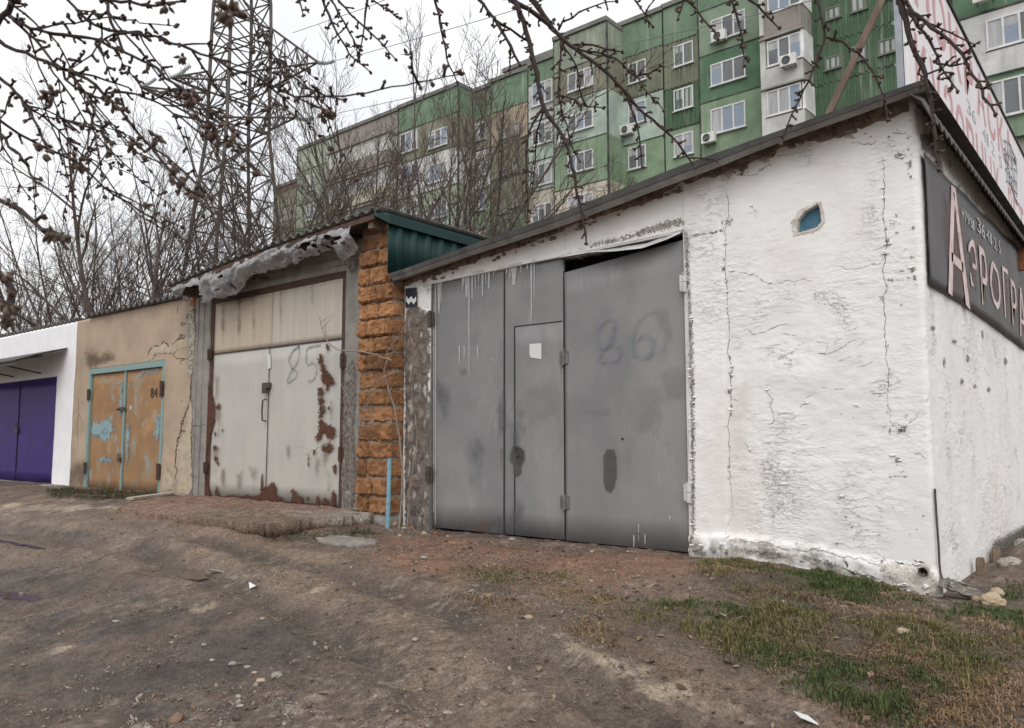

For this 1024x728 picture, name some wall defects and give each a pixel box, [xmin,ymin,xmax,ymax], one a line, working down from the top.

leakage [459,263,535,359]
peeling [91,386,130,467]
crack [147,309,204,480]
rust [204,383,336,506]
rust [307,344,336,466]
crack [691,129,929,591]
spalling [748,547,785,560]
spalling [800,556,837,568]
spalling [879,560,940,596]